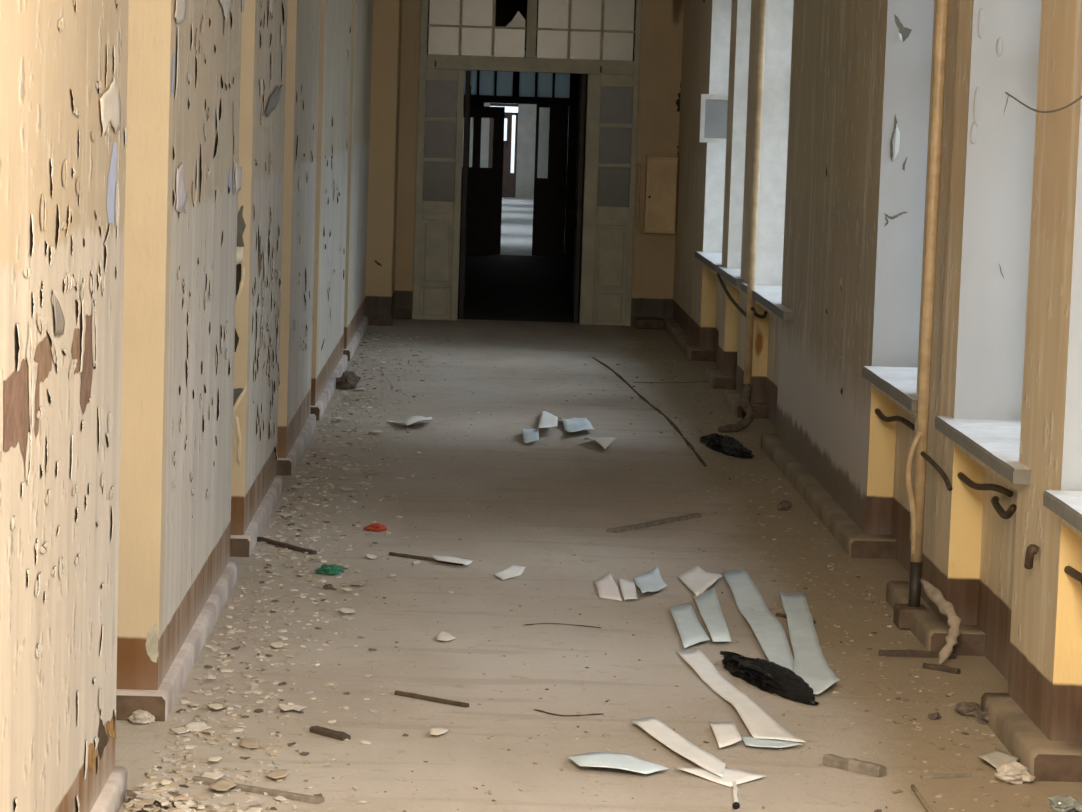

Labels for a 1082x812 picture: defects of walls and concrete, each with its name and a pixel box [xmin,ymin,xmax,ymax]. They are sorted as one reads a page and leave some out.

peeling [171,0,245,109]
peeling [260,0,285,125]
peeling [173,75,242,218]
peeling [296,135,340,203]
peeling [3,44,128,540]
peeling [294,226,331,351]
peeling [27,525,82,603]